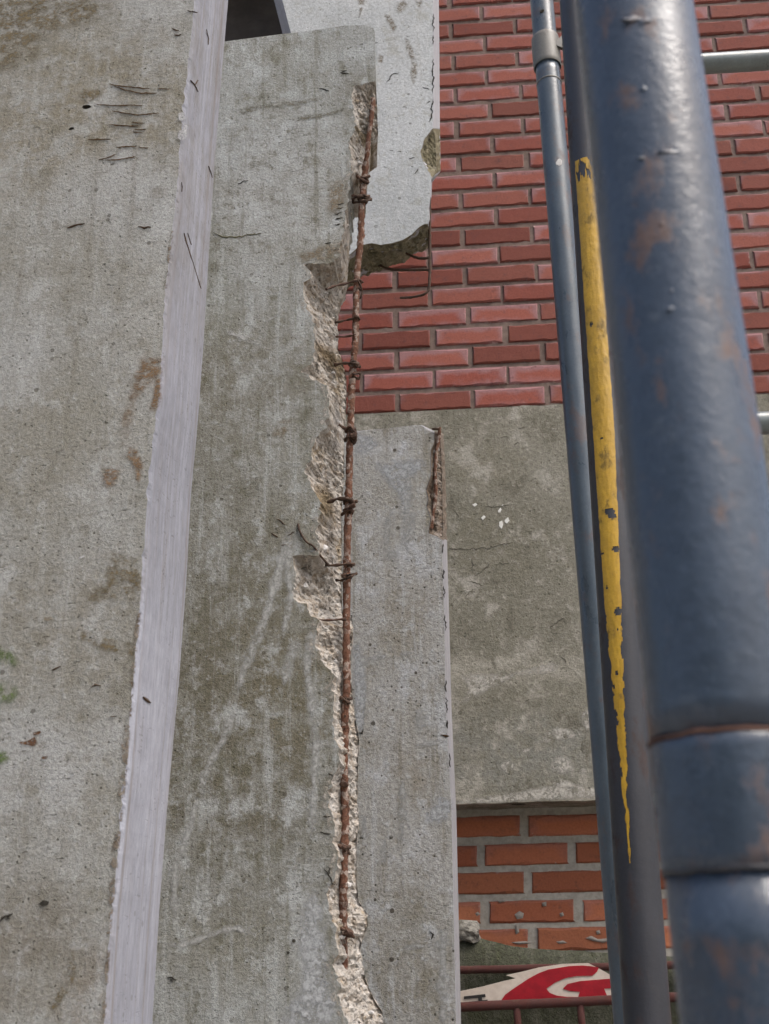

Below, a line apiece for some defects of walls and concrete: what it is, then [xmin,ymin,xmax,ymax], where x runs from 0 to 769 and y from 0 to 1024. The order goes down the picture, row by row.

spalling [420,128,441,177]
corrosion [124,358,161,419]
spalling [290,81,429,1024]